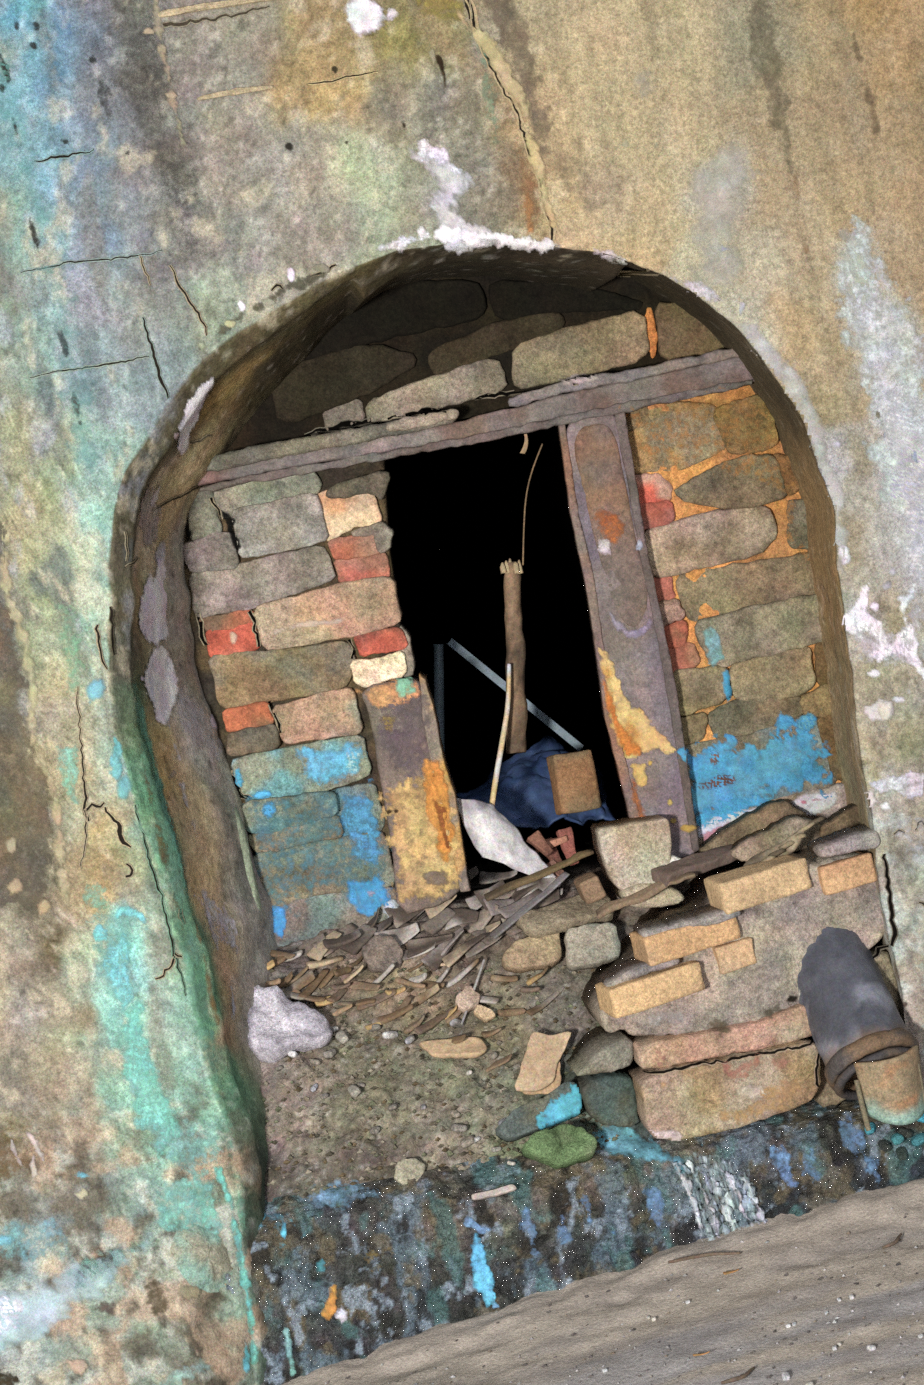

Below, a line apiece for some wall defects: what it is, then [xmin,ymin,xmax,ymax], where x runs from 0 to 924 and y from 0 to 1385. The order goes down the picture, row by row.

leakage [345,0,397,37]
crack [308,70,378,85]
crack [457,0,556,240]
leakage [379,139,554,254]
leakage [595,250,627,264]
crack [20,249,208,399]
leakage [838,216,924,679]
crack [123,531,139,569]
crack [75,607,187,996]